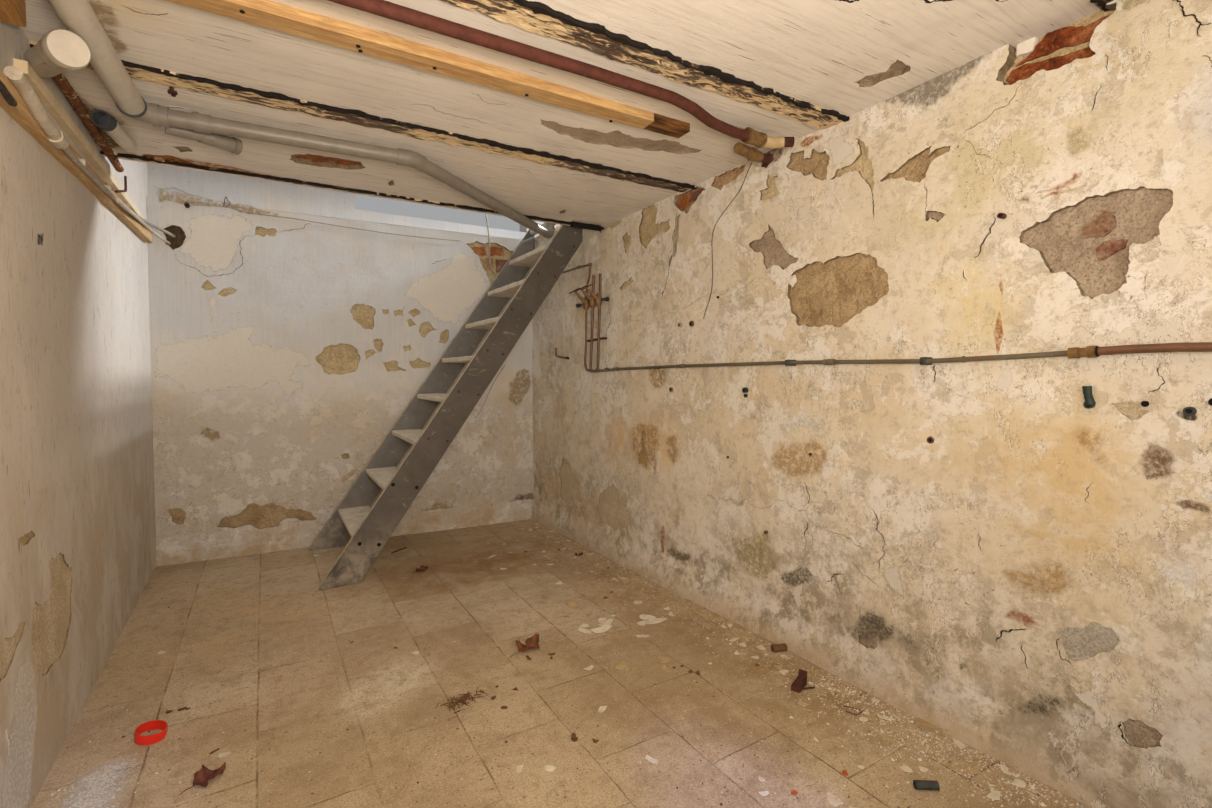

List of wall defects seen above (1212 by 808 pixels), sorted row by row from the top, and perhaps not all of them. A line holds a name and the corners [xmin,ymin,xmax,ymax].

spalling [1004,10,1115,85]
crack [1171,0,1212,68]
spalling [163,226,186,250]
spalling [255,227,276,237]
spalling [751,227,889,327]
spalling [1023,188,1173,298]
spalling [315,304,449,375]
spalling [217,503,316,529]
peeling [1074,674,1163,748]